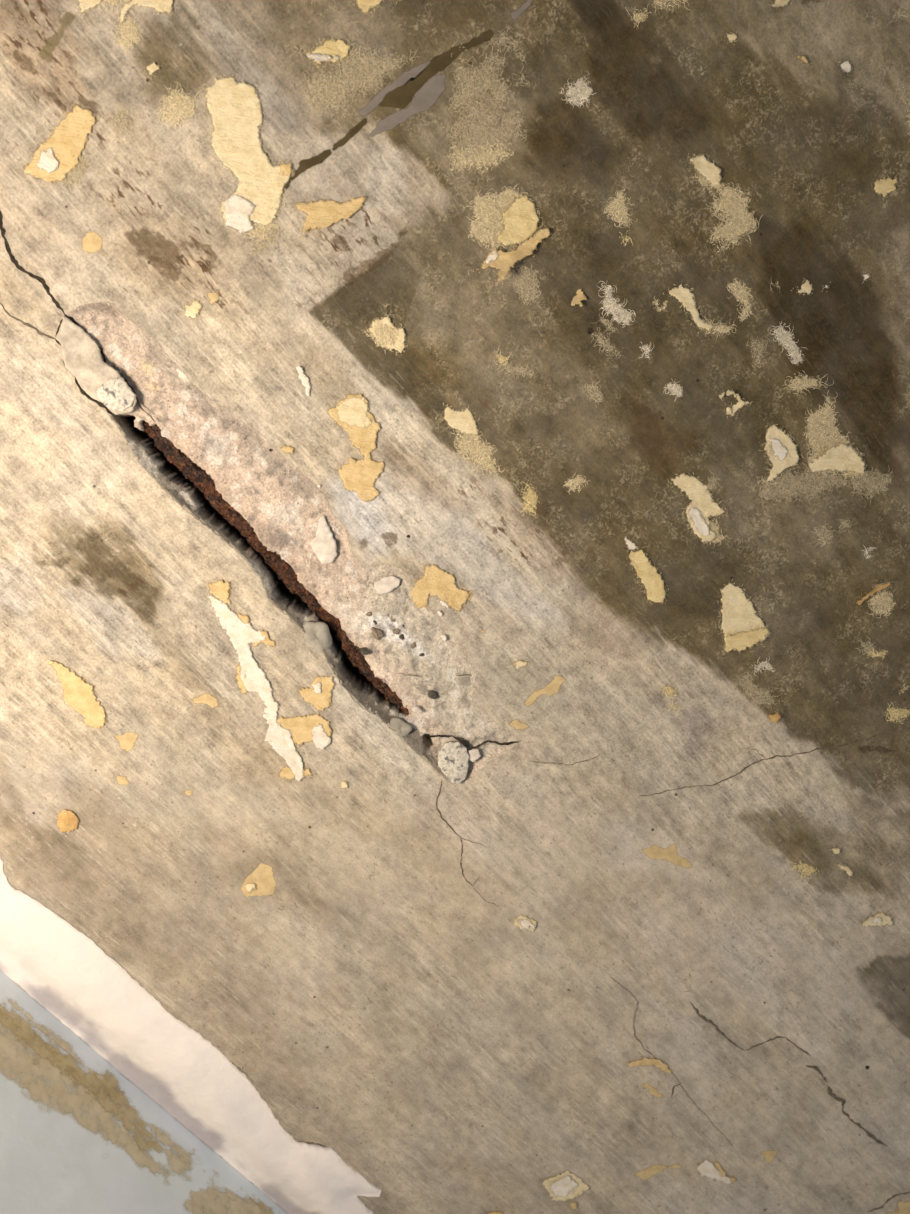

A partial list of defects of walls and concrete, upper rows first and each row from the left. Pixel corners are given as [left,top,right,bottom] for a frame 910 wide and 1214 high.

water stain [284,118,367,189]
crack [0,211,155,427]
spalling [55,301,518,785]
crack [428,735,598,766]
flaking render [0,857,382,1214]
crack [611,977,734,1148]
crack [685,990,888,1147]